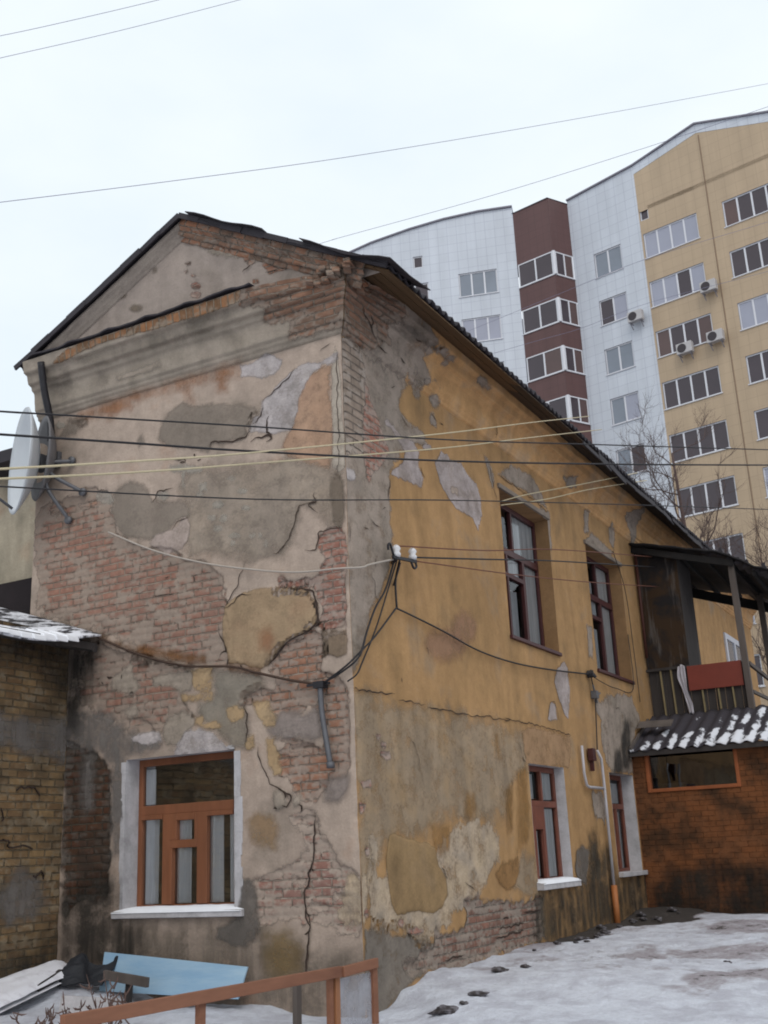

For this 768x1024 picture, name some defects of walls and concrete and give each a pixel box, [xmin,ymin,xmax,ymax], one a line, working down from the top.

crack [178,372,292,463]
crack [218,560,250,667]
crack [268,588,320,666]
flaking render [33,248,571,978]
crack [355,687,571,761]
crack [243,700,316,972]
damp [535,839,768,940]